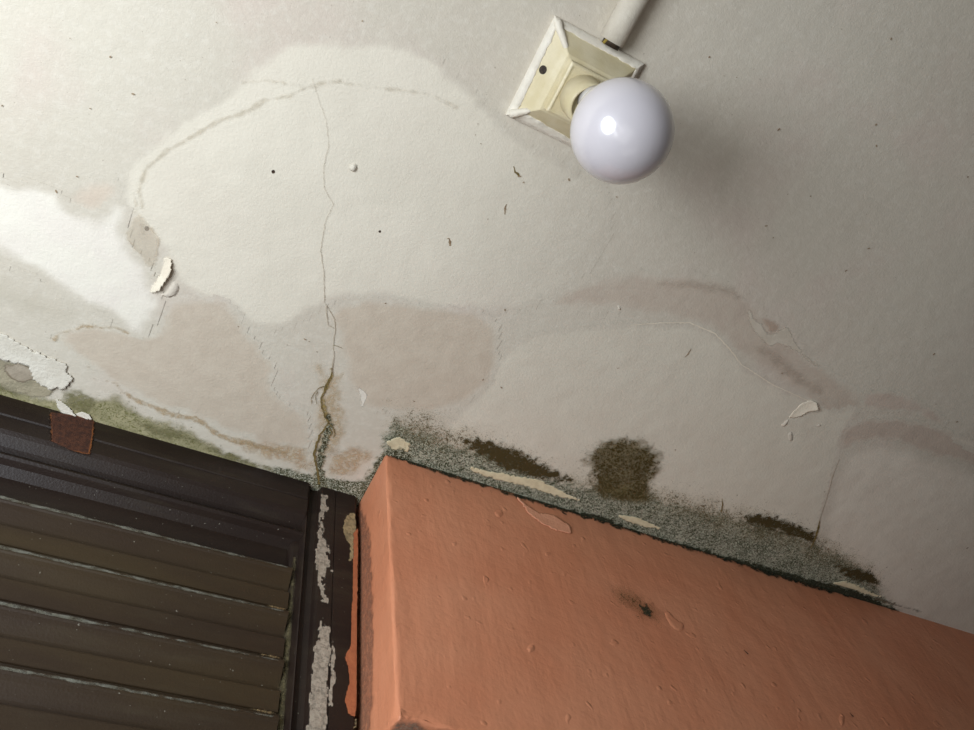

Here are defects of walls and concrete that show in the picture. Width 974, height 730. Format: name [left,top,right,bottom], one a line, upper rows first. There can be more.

peeling [150,257,172,293]
crack [311,79,341,488]
peeling [0,333,92,420]
peeling [789,400,818,418]
rust [50,412,94,454]
peeling [470,466,580,501]
water stain [590,440,658,502]
peeling [517,497,571,534]
peeling [619,515,661,529]
water stain [612,590,662,628]